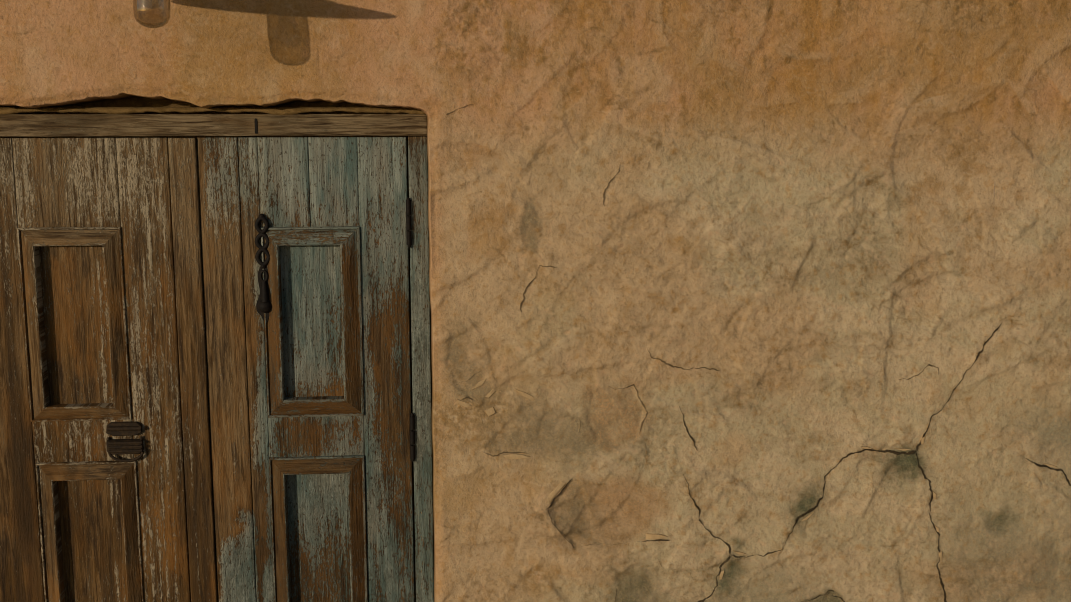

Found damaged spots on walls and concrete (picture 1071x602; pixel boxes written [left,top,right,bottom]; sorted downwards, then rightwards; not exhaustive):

crack [520,265,552,312]
crack [649,352,718,371]
crack [680,409,697,450]
crack [686,324,1001,602]
crack [1026,458,1071,486]
spalling [803,590,845,602]